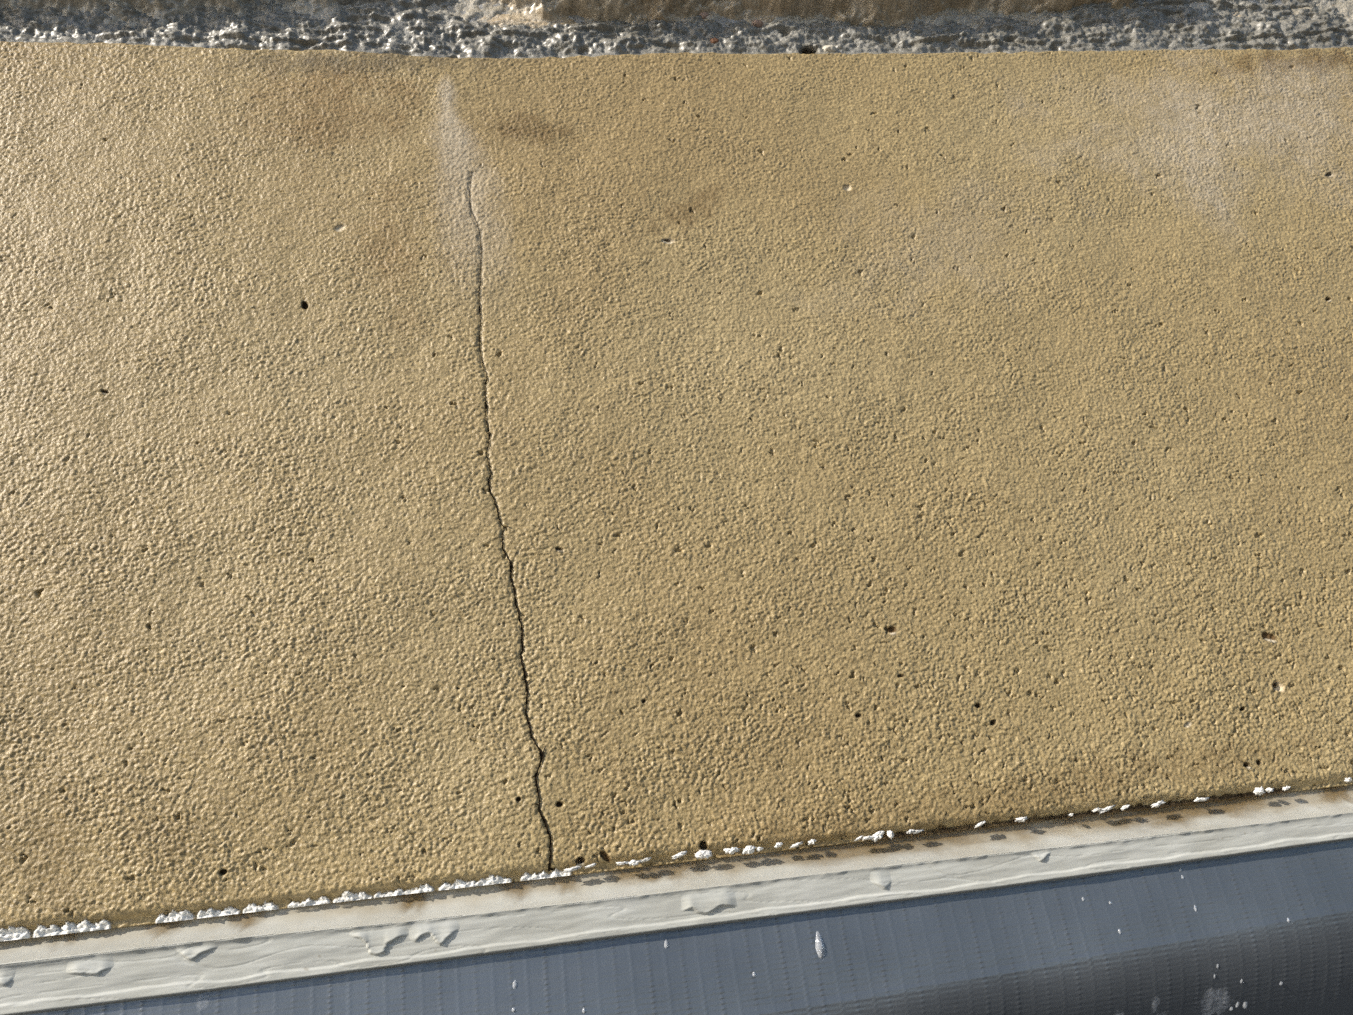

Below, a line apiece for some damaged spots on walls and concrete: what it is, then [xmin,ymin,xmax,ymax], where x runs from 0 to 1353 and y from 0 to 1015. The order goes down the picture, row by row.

crack [469,172,555,871]